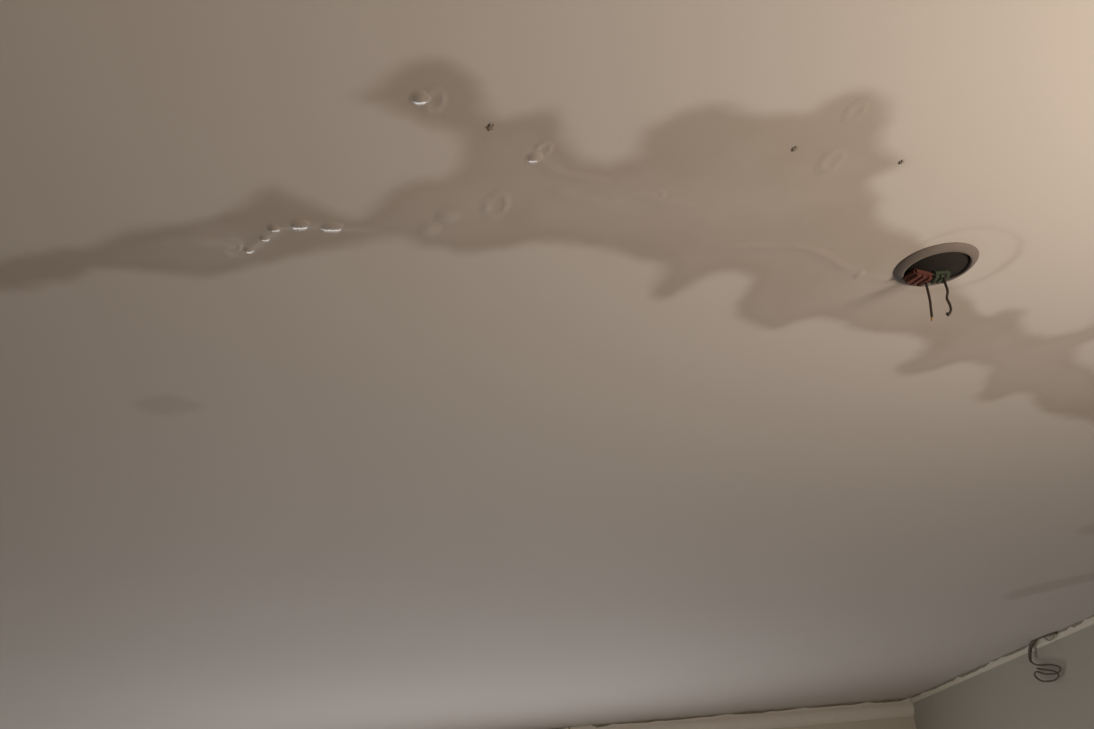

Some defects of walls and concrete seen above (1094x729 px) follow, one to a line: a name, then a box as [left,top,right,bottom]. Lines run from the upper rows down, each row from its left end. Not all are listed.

damp [0,47,1094,434]